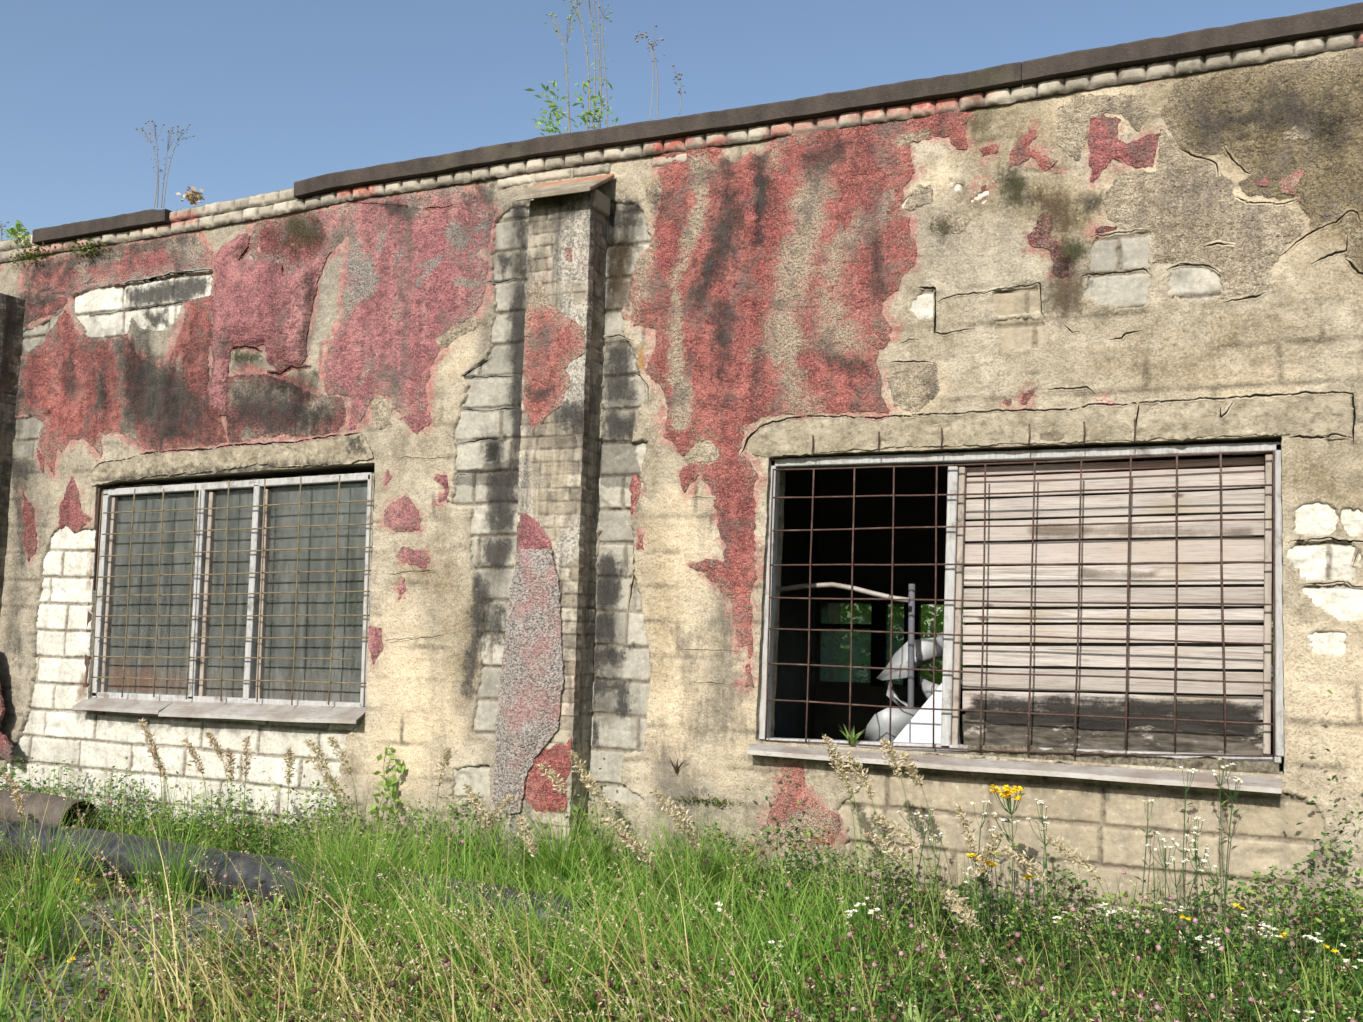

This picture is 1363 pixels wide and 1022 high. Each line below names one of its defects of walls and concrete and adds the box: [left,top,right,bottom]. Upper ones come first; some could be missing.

crack [1177,145,1363,277]
peeling [14,186,586,741]
damp [462,200,554,697]
damp [558,404,583,430]
damp [602,343,637,443]
peeling [588,52,1363,803]
crack [738,384,1359,456]
spalling [0,477,362,825]
damp [592,555,634,747]
spalling [453,765,491,801]
peeling [525,738,574,813]